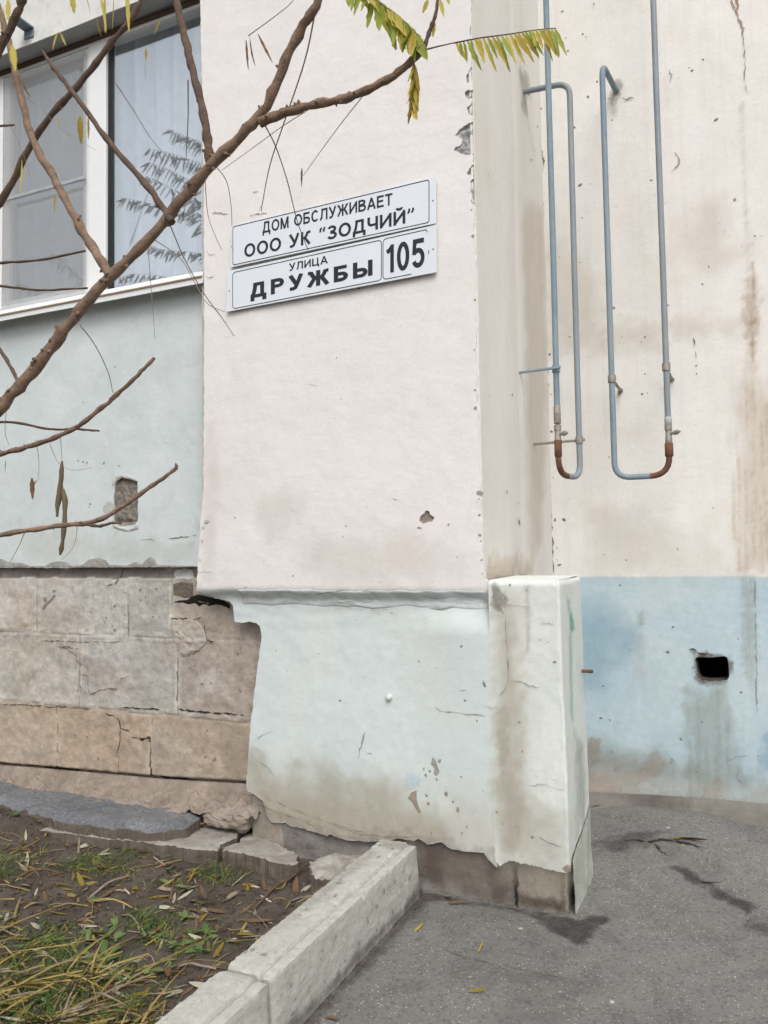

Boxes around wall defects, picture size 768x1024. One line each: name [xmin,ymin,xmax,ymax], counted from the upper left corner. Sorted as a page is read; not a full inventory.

spalling [455,67,475,211]
flaking render [417,511,435,529]
crack [2,614,244,783]